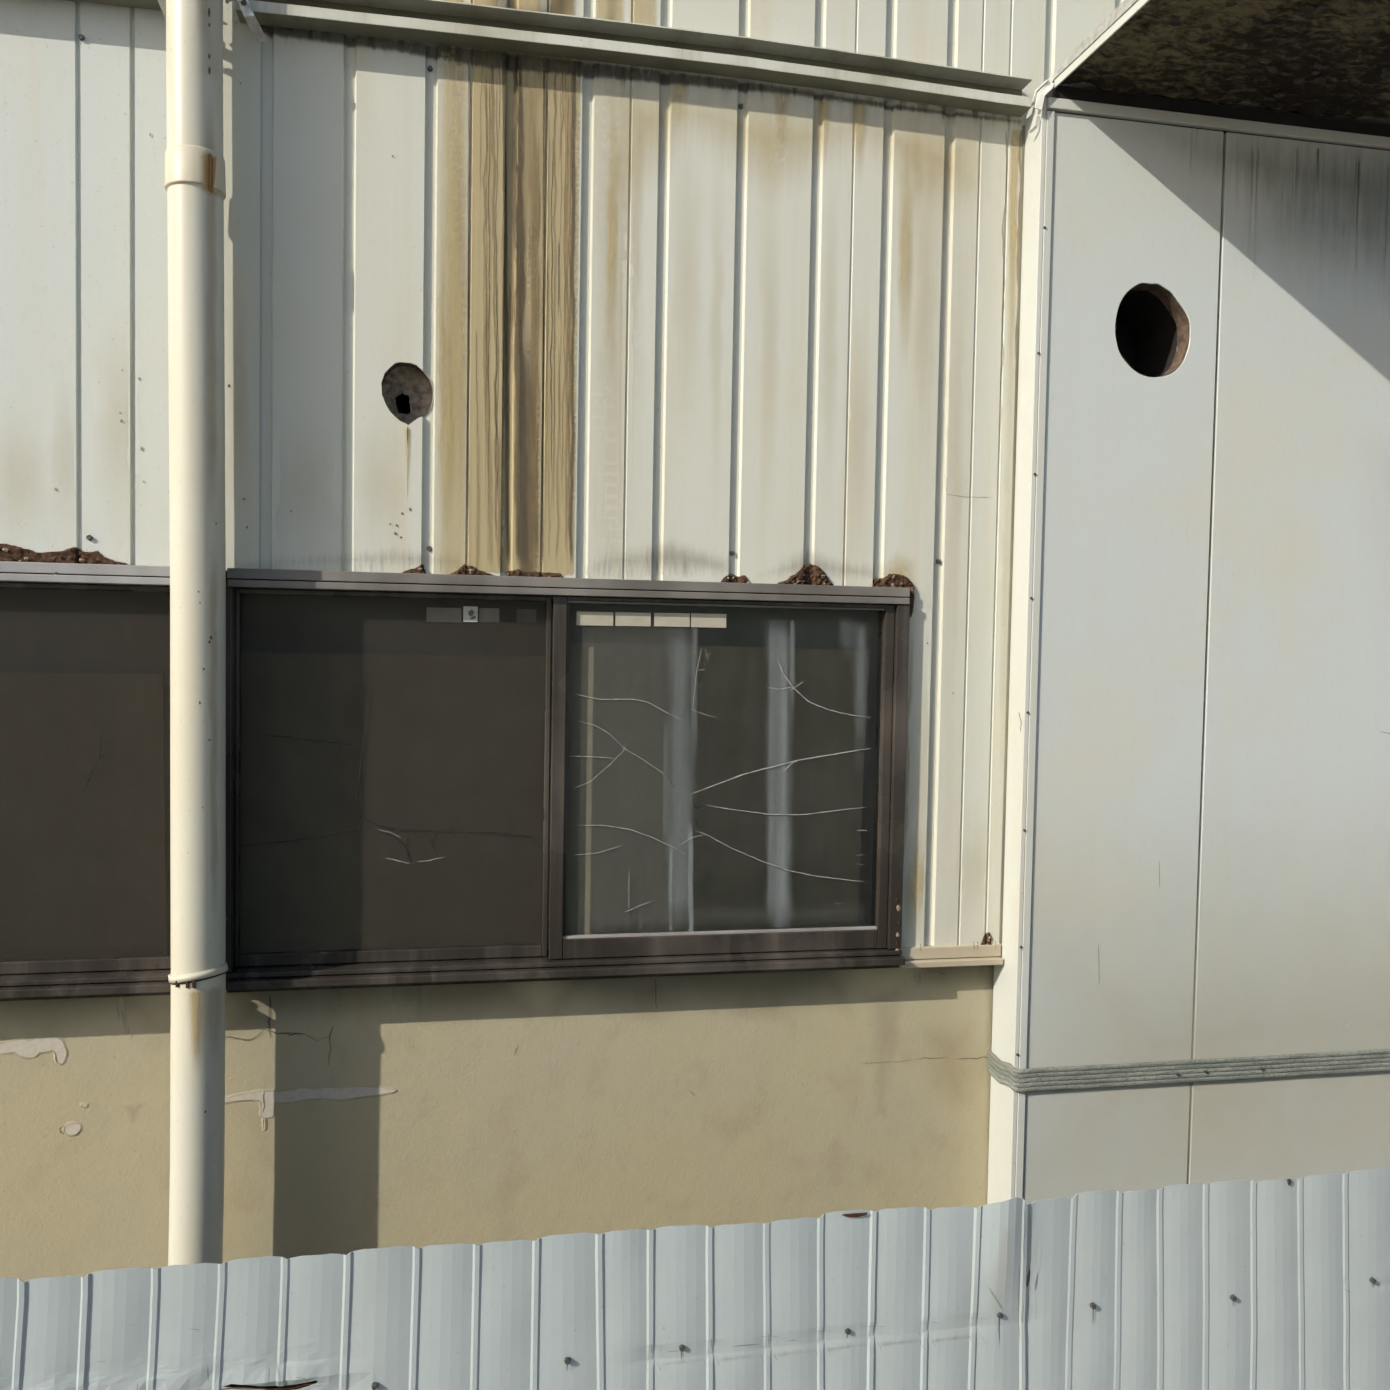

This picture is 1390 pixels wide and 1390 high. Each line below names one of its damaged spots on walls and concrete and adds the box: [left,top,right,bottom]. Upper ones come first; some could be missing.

water stain [260,25,989,574]
rust [0,543,129,565]
rust [721,574,751,583]
rust [777,564,833,585]
rust [872,574,915,617]
peeling [0,1035,69,1066]
peeling [62,1102,89,1137]
peeling [225,1085,398,1132]